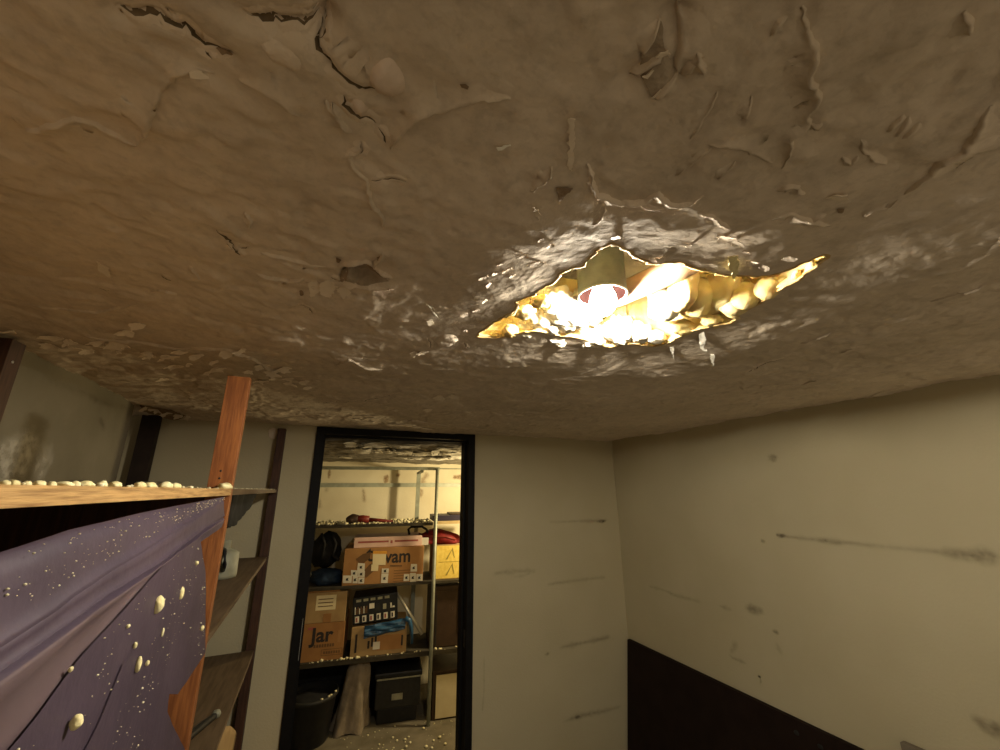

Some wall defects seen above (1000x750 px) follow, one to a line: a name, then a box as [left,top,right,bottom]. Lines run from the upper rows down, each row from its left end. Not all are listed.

crack [110,0,233,60]
crack [242,0,381,134]
spalling [297,253,393,313]
peeling [460,255,544,318]
peeling [698,332,715,365]